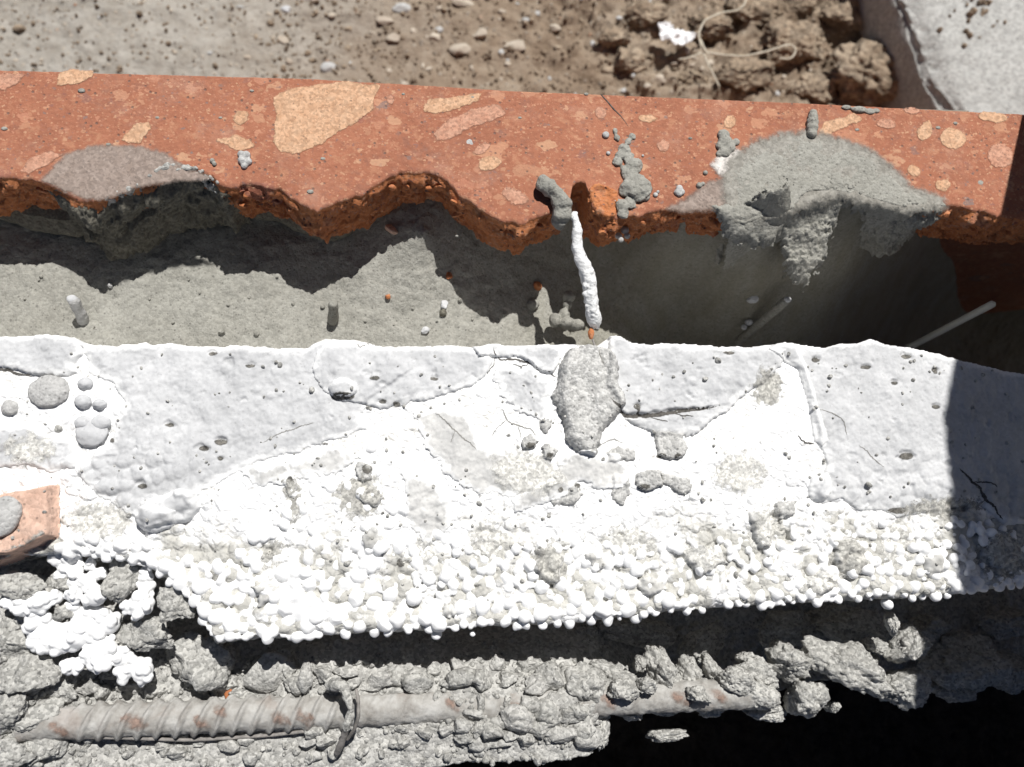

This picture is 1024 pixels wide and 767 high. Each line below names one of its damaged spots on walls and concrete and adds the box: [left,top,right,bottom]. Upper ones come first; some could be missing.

spalling [231,190,346,240]
spalling [364,184,467,226]
spalling [483,218,544,250]
spalling [583,183,718,242]
spalling [929,211,1014,242]
crack [600,397,717,445]
water stain [281,475,305,524]
water stain [332,473,385,521]
crack [959,468,1003,520]
water stain [530,537,568,589]
water stain [747,503,780,557]
water stain [798,494,982,598]